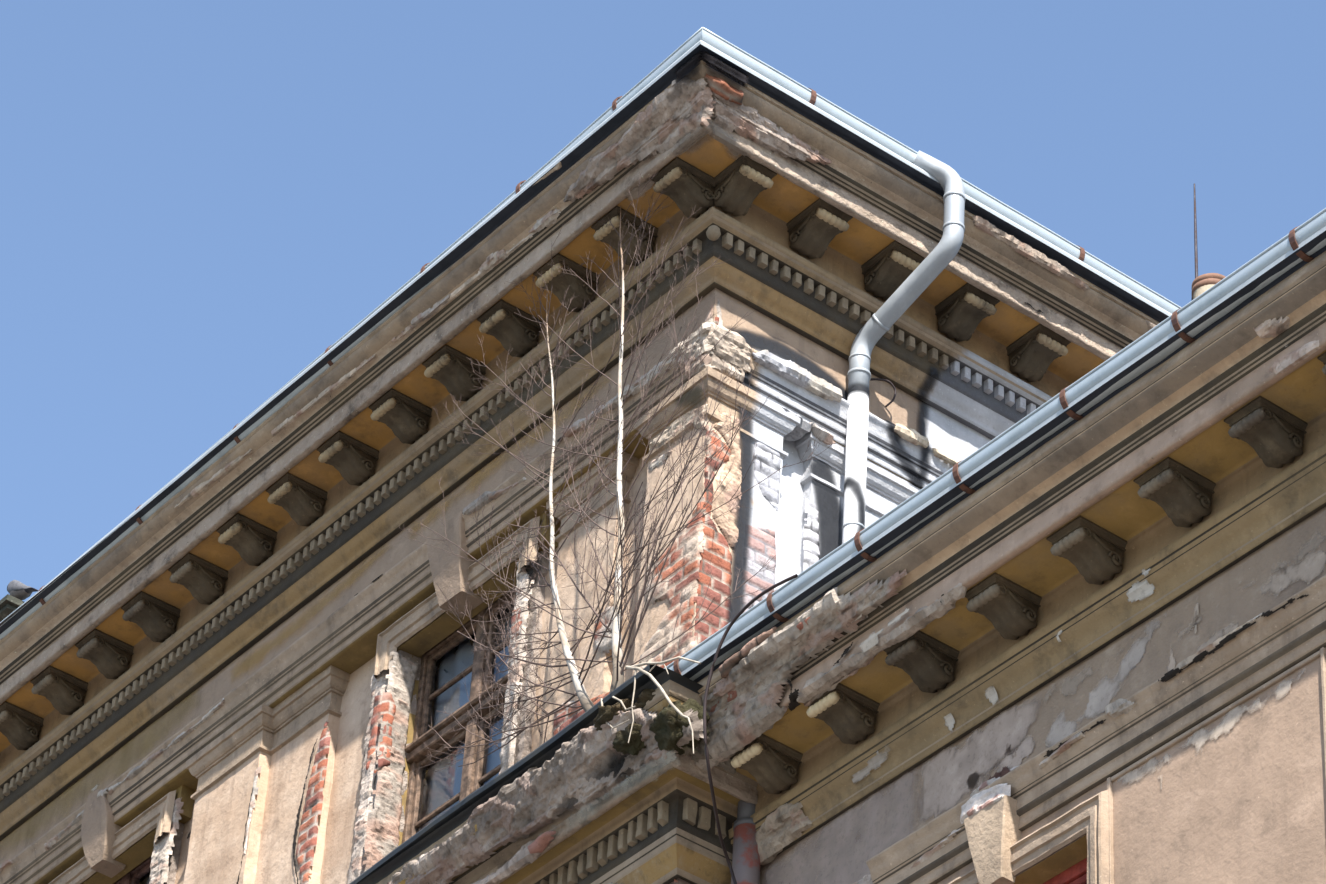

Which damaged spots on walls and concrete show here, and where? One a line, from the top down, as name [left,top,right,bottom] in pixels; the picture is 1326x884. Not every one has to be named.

flaking render [391,51,832,343]
flaking render [633,404,837,676]
flaking render [149,797,191,884]
crack [236,766,261,884]
flaking render [292,721,331,884]
flaking render [348,650,418,884]
flaking render [499,562,534,774]
flaking render [797,583,967,706]
peeling [755,623,1158,884]
crack [1043,719,1106,757]
flaking render [1168,604,1262,671]
crack [1158,595,1308,682]